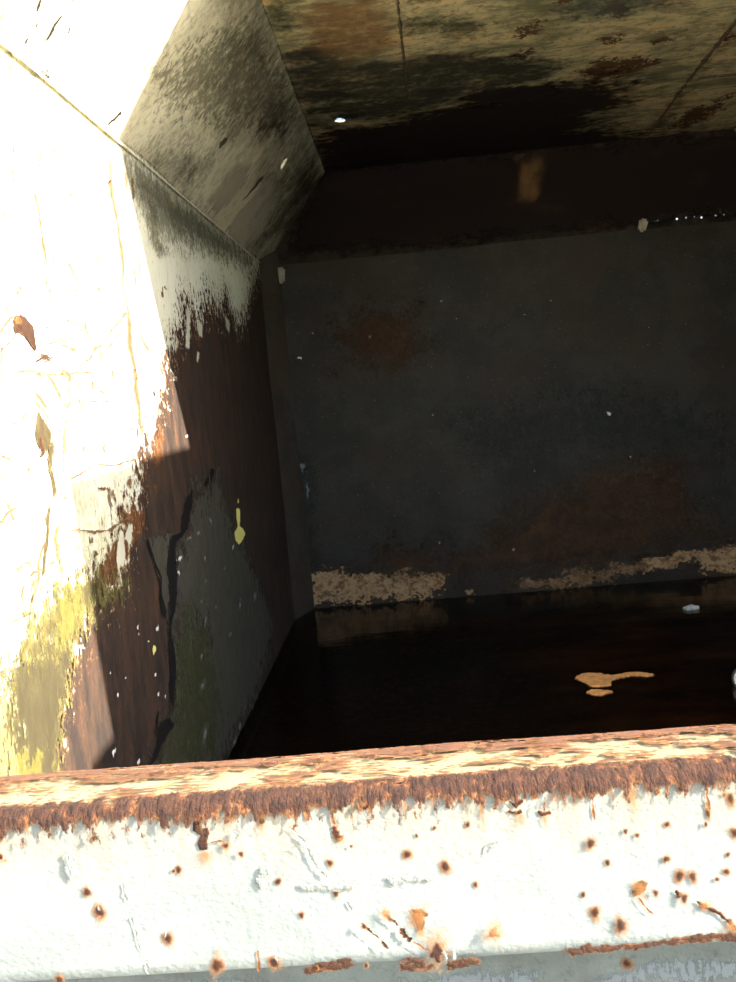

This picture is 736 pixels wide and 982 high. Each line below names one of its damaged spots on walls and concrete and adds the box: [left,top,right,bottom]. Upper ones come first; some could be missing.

leakage [145,14,736,260]
crack [144,459,275,767]
leakage [8,574,84,775]
rust [193,817,244,862]
rust [330,809,353,848]
rust [508,792,552,824]
rust [440,860,451,874]
rust [83,887,106,921]
rust [563,856,736,968]
rust [162,932,173,945]
rust [382,908,481,972]
rust [304,957,369,975]